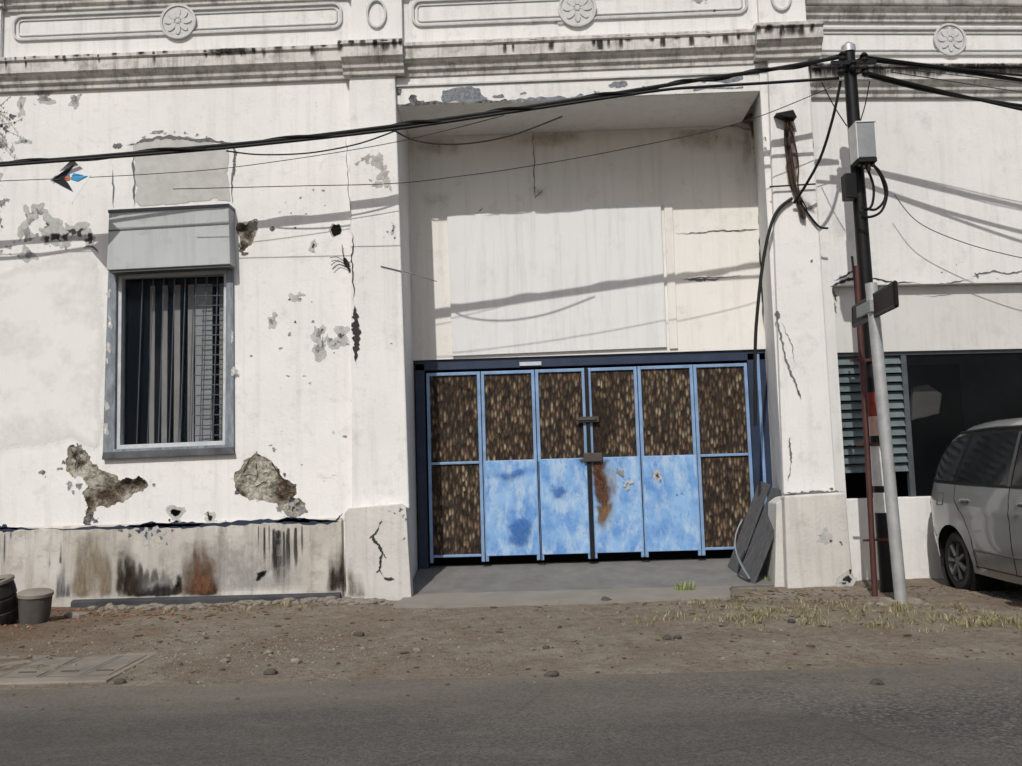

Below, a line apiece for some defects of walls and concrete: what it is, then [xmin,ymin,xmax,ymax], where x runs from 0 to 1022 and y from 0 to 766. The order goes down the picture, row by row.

water stain [203,46,282,56]
water stain [337,38,402,51]
peeling [0,203,96,263]
flaking render [236,218,275,256]
crack [351,238,361,361]
crack [679,217,801,398]
crack [830,270,1022,302]
flaking render [57,443,156,525]
flaking render [233,445,308,518]
rust [580,393,611,522]
water stain [57,526,303,597]
crack [370,521,394,581]